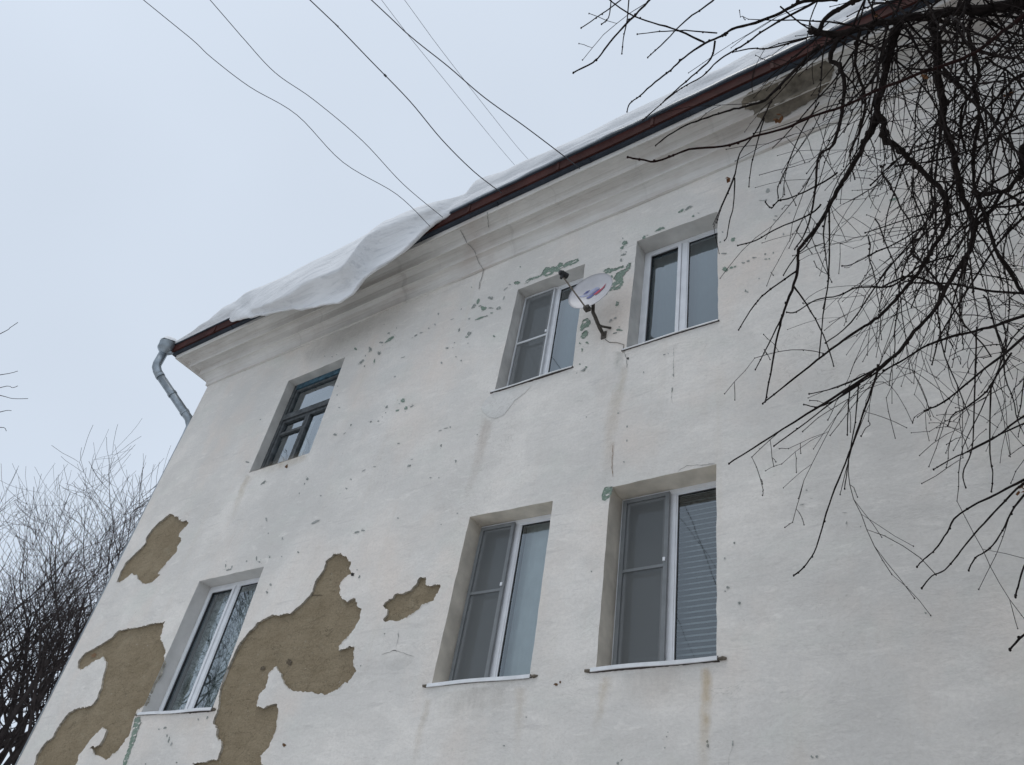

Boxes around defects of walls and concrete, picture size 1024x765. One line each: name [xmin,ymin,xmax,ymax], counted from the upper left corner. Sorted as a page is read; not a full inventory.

peeling [446,259,579,361]
peeling [603,237,631,334]
flaking render [118,515,188,584]
flaking render [384,578,441,634]
flaking render [36,621,166,765]
flaking render [193,553,361,765]